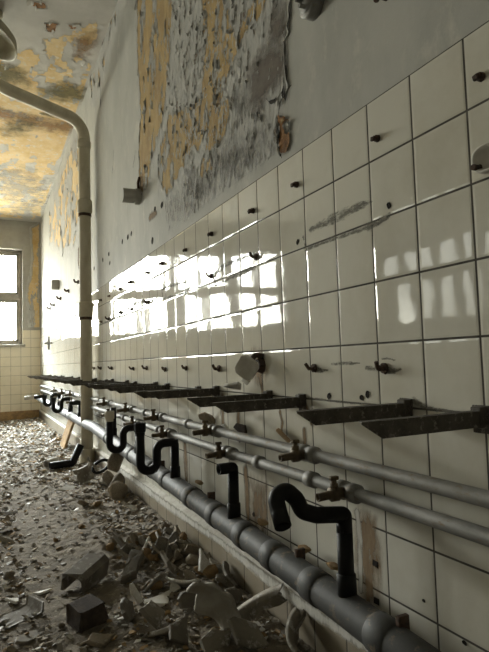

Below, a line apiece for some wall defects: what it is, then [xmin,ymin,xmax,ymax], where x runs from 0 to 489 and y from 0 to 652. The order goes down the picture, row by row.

water stain [0,109,73,132]
peeling [0,0,120,117]
water stain [45,84,87,101]
peeling [134,0,290,221]
water stain [234,50,284,126]
peeling [0,93,79,327]
corrosion [355,509,380,604]